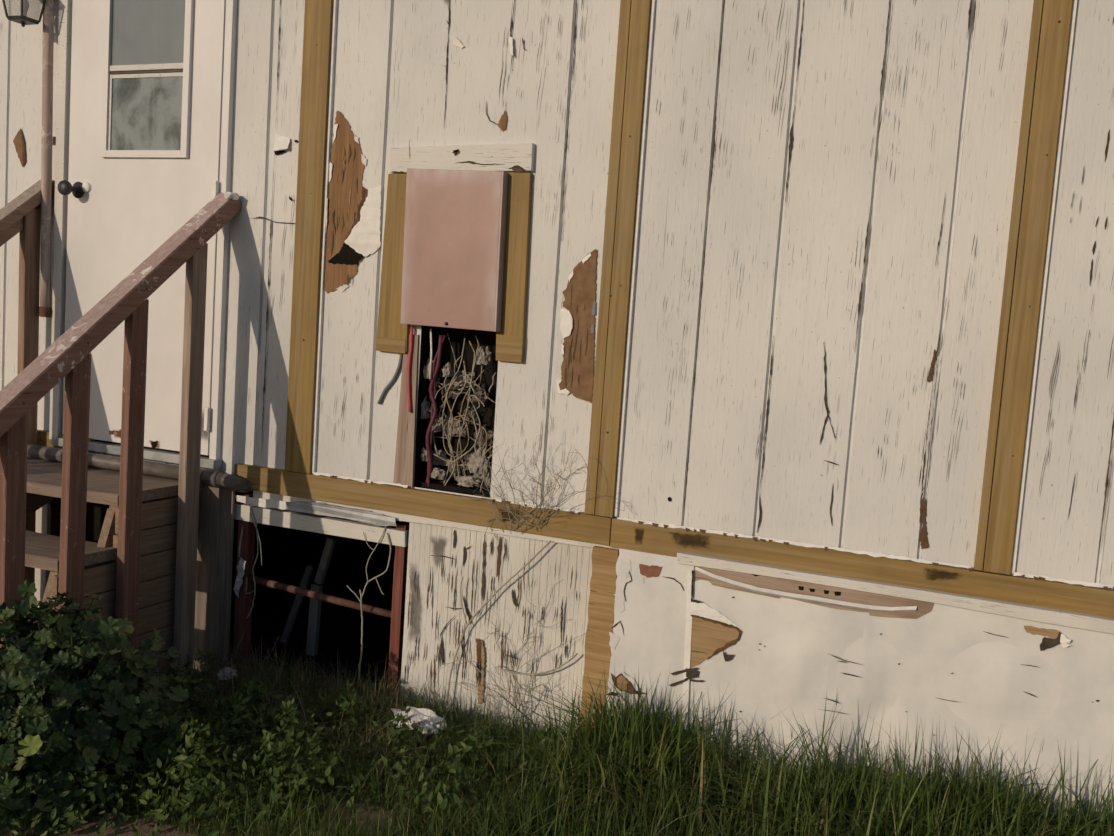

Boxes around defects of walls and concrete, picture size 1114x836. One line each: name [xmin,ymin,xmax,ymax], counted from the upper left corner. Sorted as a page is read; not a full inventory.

peeling [13,128,26,167]
peeling [324,111,381,293]
crack [443,0,588,241]
peeling [556,249,597,403]
crack [634,224,707,514]
crack [656,0,804,202]
crack [755,336,779,531]
crack [820,348,839,524]
crack [846,208,870,353]
crack [869,0,946,265]
peeling [609,559,662,650]
peeling [689,598,741,629]